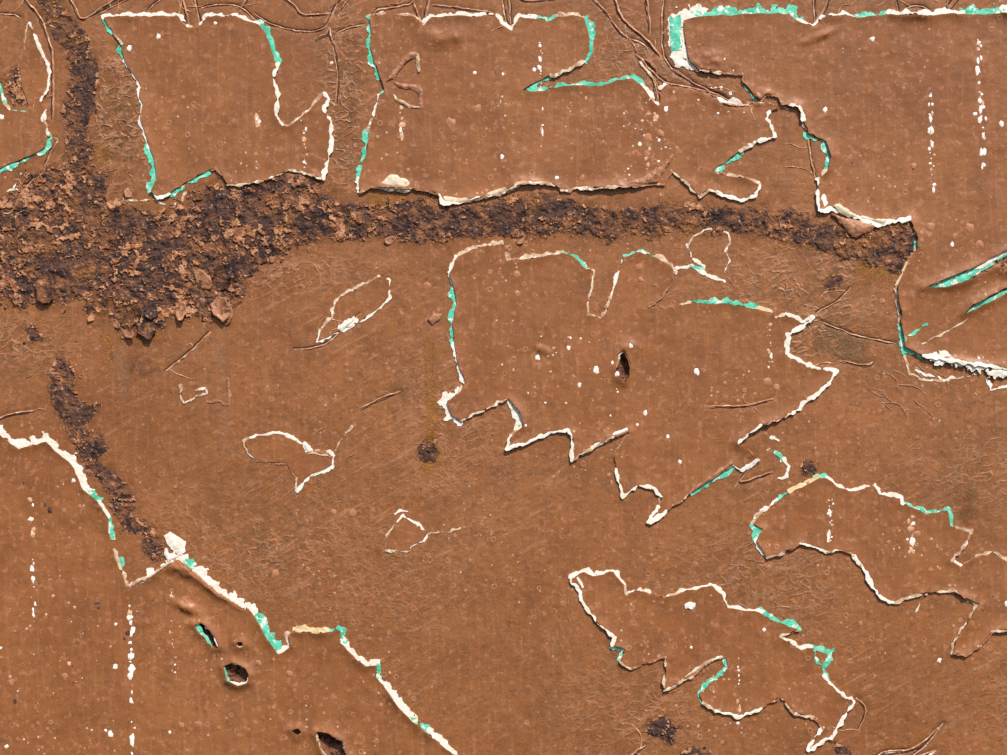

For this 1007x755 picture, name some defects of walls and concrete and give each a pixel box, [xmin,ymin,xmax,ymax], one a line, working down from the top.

peeling [101,11,334,205]
crack [0,0,552,214]
rust [0,0,918,344]
crack [592,0,756,120]
peeling [355,3,1007,391]
crack [804,286,896,369]
rust [48,356,166,563]
peeling [428,228,1007,657]
peeling [0,425,461,755]
peeling [568,567,855,752]
rust [833,742,854,755]
crack [876,722,945,755]